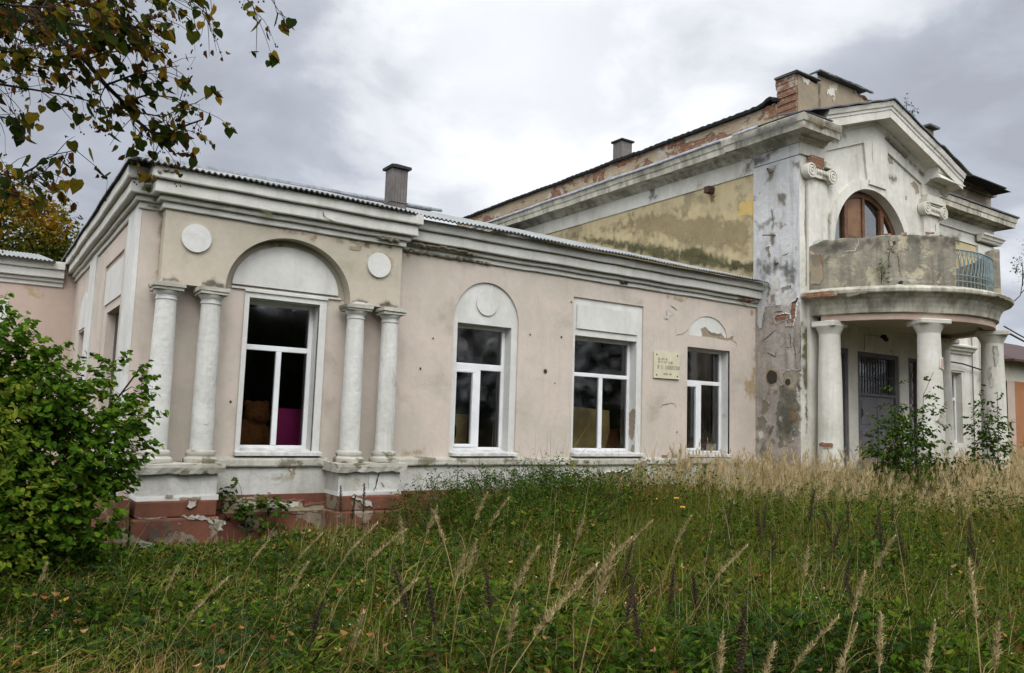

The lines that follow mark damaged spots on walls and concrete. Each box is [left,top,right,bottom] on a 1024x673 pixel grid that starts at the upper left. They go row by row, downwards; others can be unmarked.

flaking render [659,138,684,150]
flaking render [598,157,633,182]
leakage [685,248,706,258]
peeling [737,186,837,329]
peeling [701,327,734,340]
spalling [351,494,373,507]
spalling [166,495,325,532]